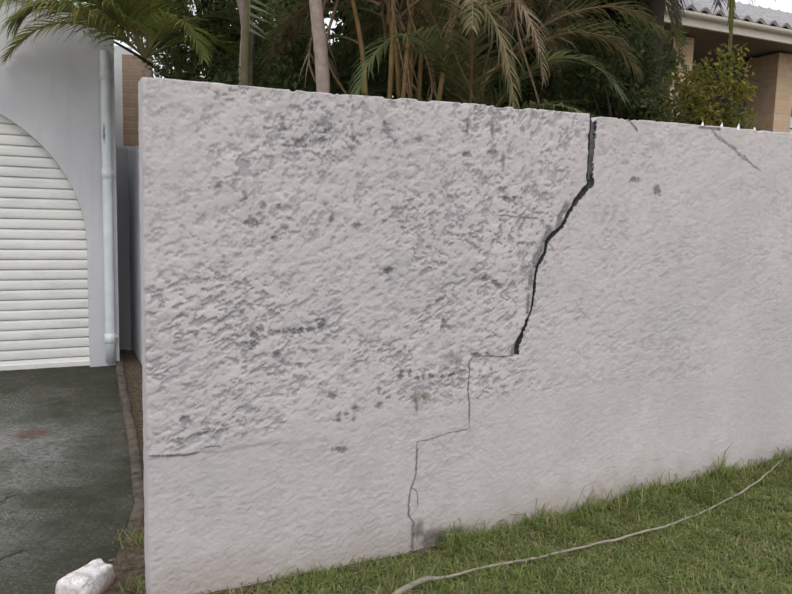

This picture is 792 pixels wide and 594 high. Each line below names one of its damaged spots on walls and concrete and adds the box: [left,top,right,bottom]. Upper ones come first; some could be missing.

crack [408,116,597,552]
crack [699,126,761,171]